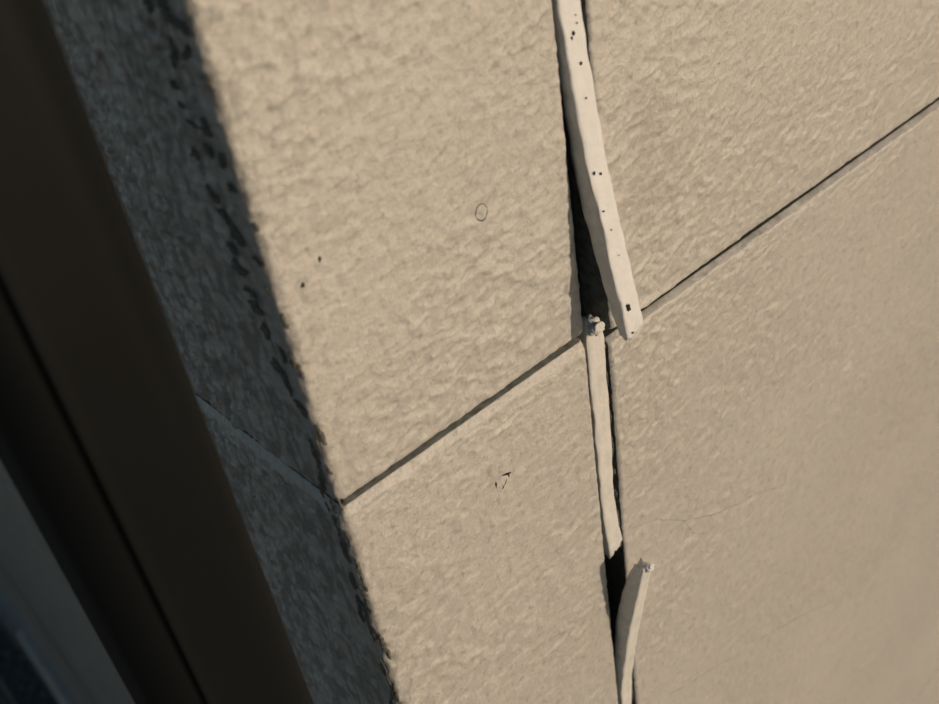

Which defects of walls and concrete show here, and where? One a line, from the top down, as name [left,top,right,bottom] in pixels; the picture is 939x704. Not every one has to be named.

peeling [551,0,643,559]
peeling [614,558,655,704]